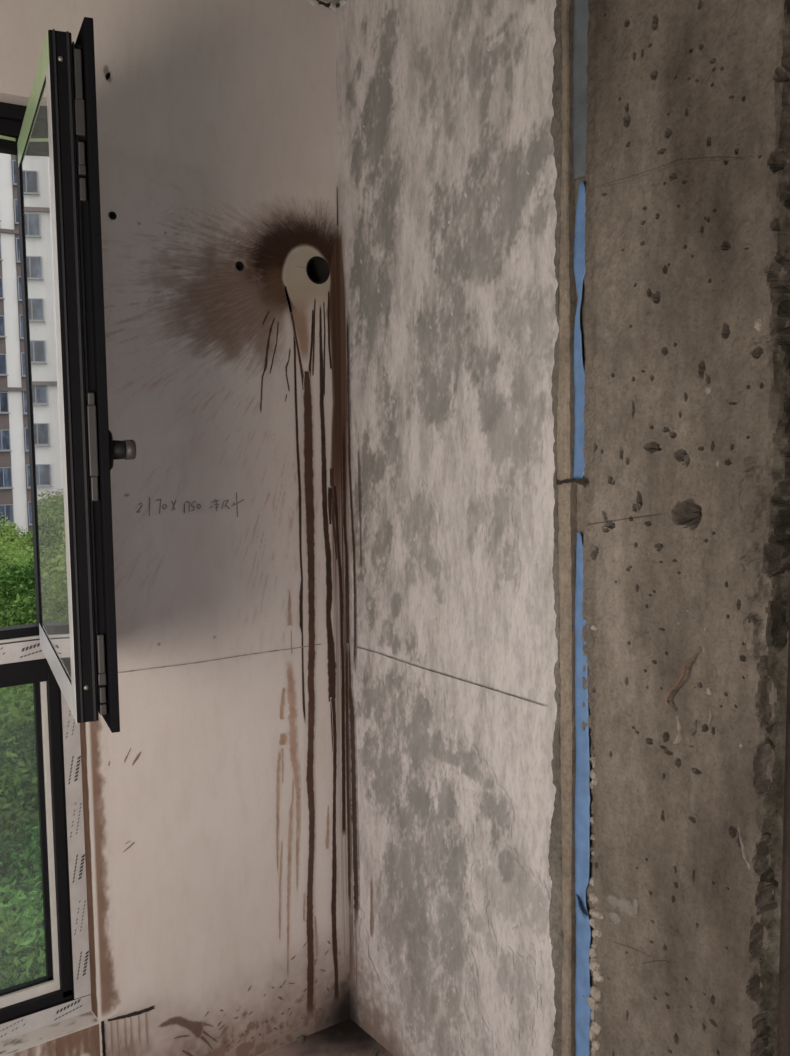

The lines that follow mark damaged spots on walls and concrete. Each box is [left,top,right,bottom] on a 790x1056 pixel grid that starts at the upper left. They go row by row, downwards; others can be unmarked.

leakage [102,63,113,85]
leakage [101,157,384,1052]